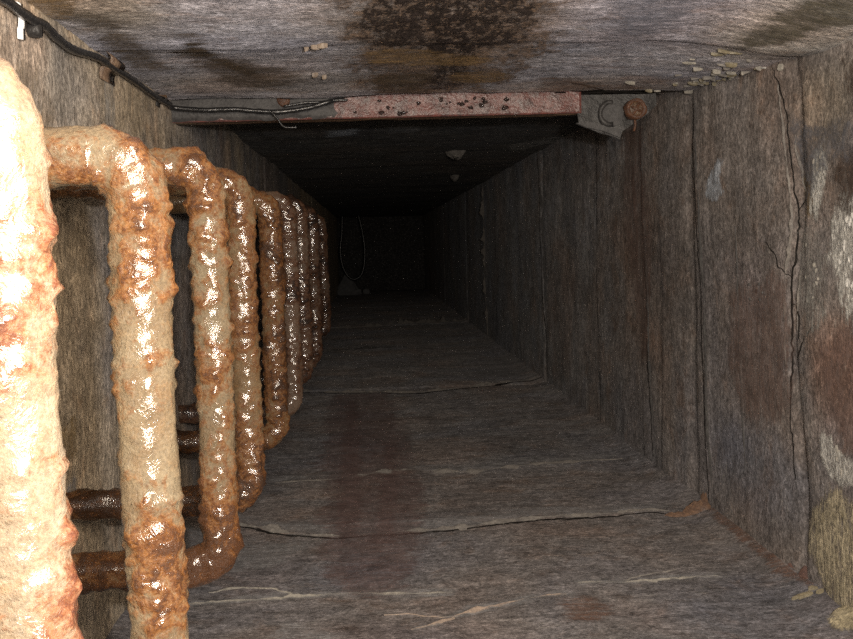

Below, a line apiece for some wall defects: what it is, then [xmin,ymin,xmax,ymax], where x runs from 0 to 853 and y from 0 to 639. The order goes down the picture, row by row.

crack [765,67,815,480]
damp [808,488,853,630]